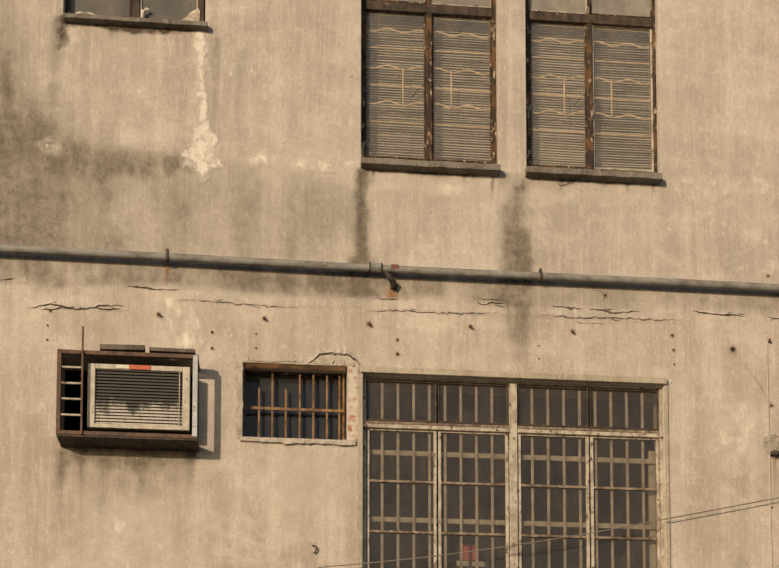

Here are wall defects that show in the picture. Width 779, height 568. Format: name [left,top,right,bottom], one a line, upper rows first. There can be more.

leakage [57,15,192,46]
peeling [181,31,223,182]
leakage [0,79,151,245]
leakage [351,195,388,295]
crack [30,285,180,310]
crack [200,299,296,308]
leakage [307,274,342,292]
crack [369,298,507,314]
leakage [499,226,532,326]
crack [548,290,667,324]
crack [692,309,745,317]
spalling [235,349,361,447]